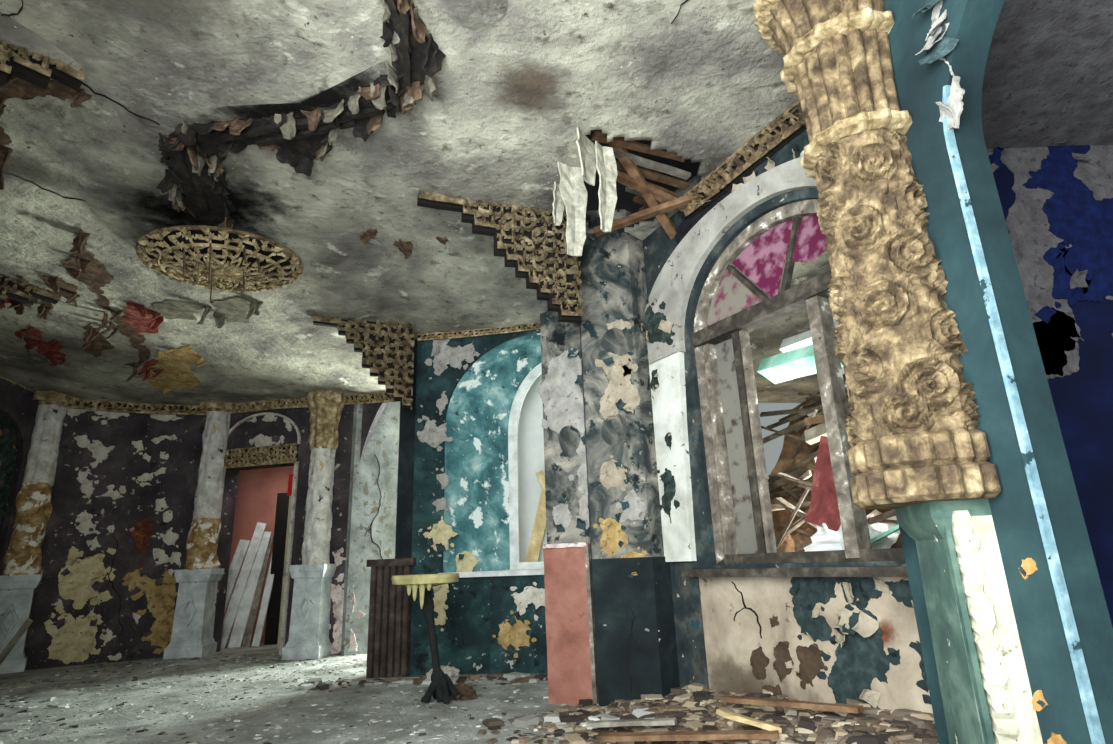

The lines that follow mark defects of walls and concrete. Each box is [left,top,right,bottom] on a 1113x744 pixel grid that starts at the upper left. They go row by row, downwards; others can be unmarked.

spalling [156,0,446,229]
peeling [912,0,965,129]
spalling [44,408,185,664]
peeling [417,391,453,451]
spalling [423,473,478,578]
peeling [425,338,480,376]
spalling [538,348,680,578]
peeling [606,299,675,345]
peeling [987,139,1113,379]
spalling [492,582,545,658]
crack [732,582,762,638]
peeling [750,564,931,708]